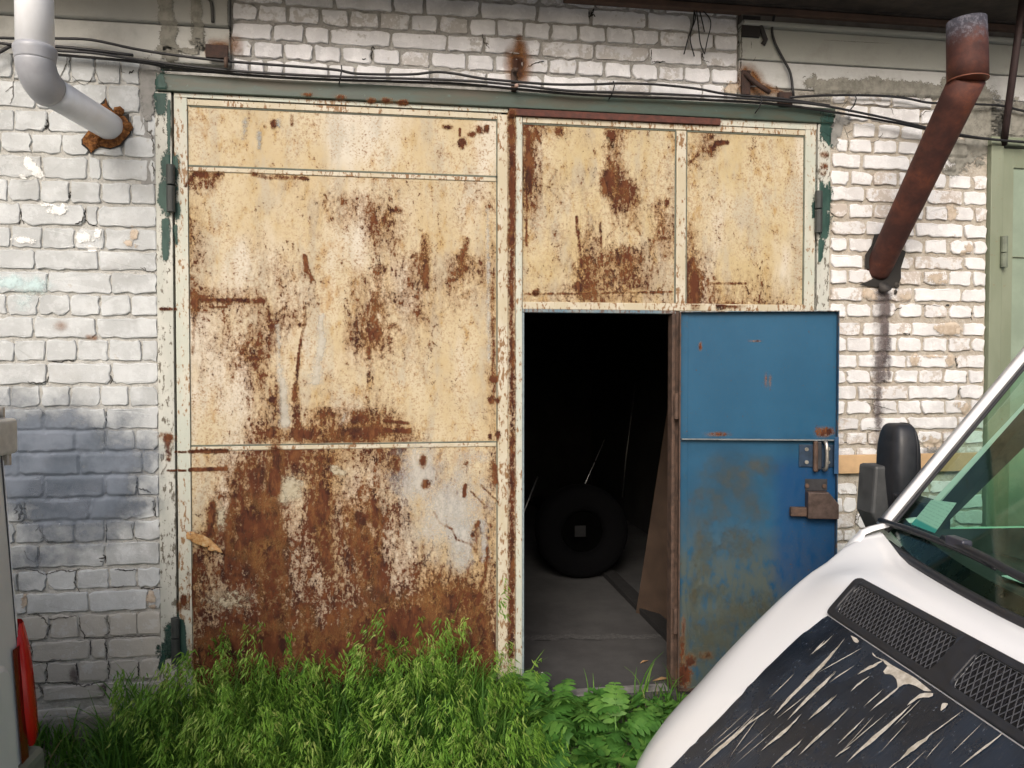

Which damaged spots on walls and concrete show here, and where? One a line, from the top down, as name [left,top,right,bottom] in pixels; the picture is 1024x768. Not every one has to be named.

rust [508,37,528,81]
rust [158,108,801,702]
leakage [874,292,891,423]